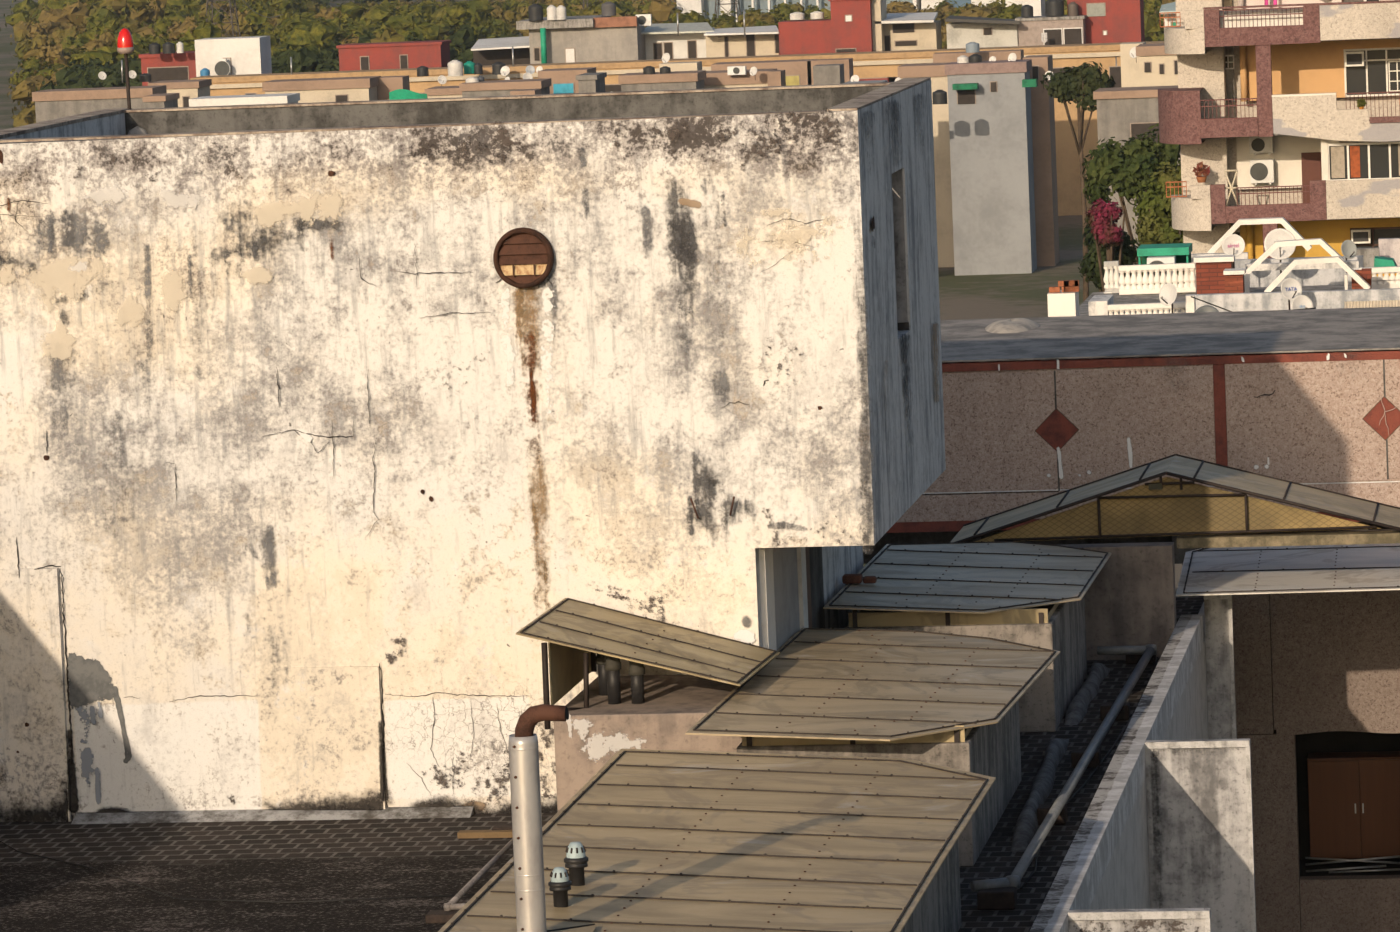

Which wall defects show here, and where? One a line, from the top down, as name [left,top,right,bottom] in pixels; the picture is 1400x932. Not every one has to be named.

damp [401,121,525,167]
damp [715,108,842,170]
damp [38,210,109,254]
damp [641,180,726,308]
rust [513,287,540,422]
damp [686,275,875,553]
rust [530,452,547,593]
crack [124,694,248,702]
crack [379,663,527,807]
damp [411,751,512,814]
damp [536,724,558,813]
damp [1073,910,1199,932]